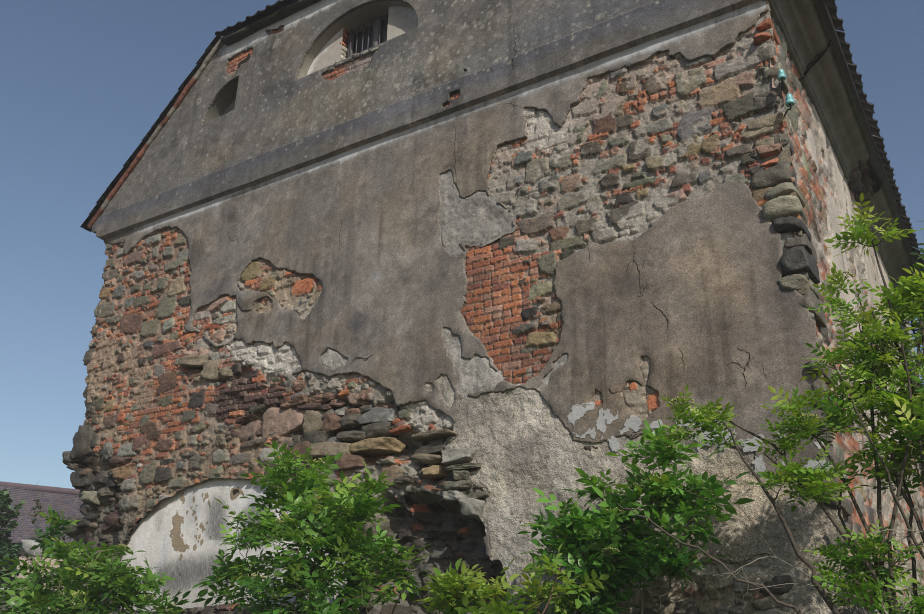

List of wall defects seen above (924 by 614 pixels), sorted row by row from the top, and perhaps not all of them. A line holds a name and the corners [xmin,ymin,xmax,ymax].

spalling [226,49,253,74]
spalling [237,259,322,319]
crack [626,244,684,363]
peeling [321,348,348,370]
peeling [539,354,568,390]
peeling [425,374,455,409]
peeling [567,390,603,426]
peeling [573,408,618,440]
peeling [802,460,832,472]
peeling [170,492,211,561]
peeling [766,479,856,609]
flaking render [77,575,260,614]